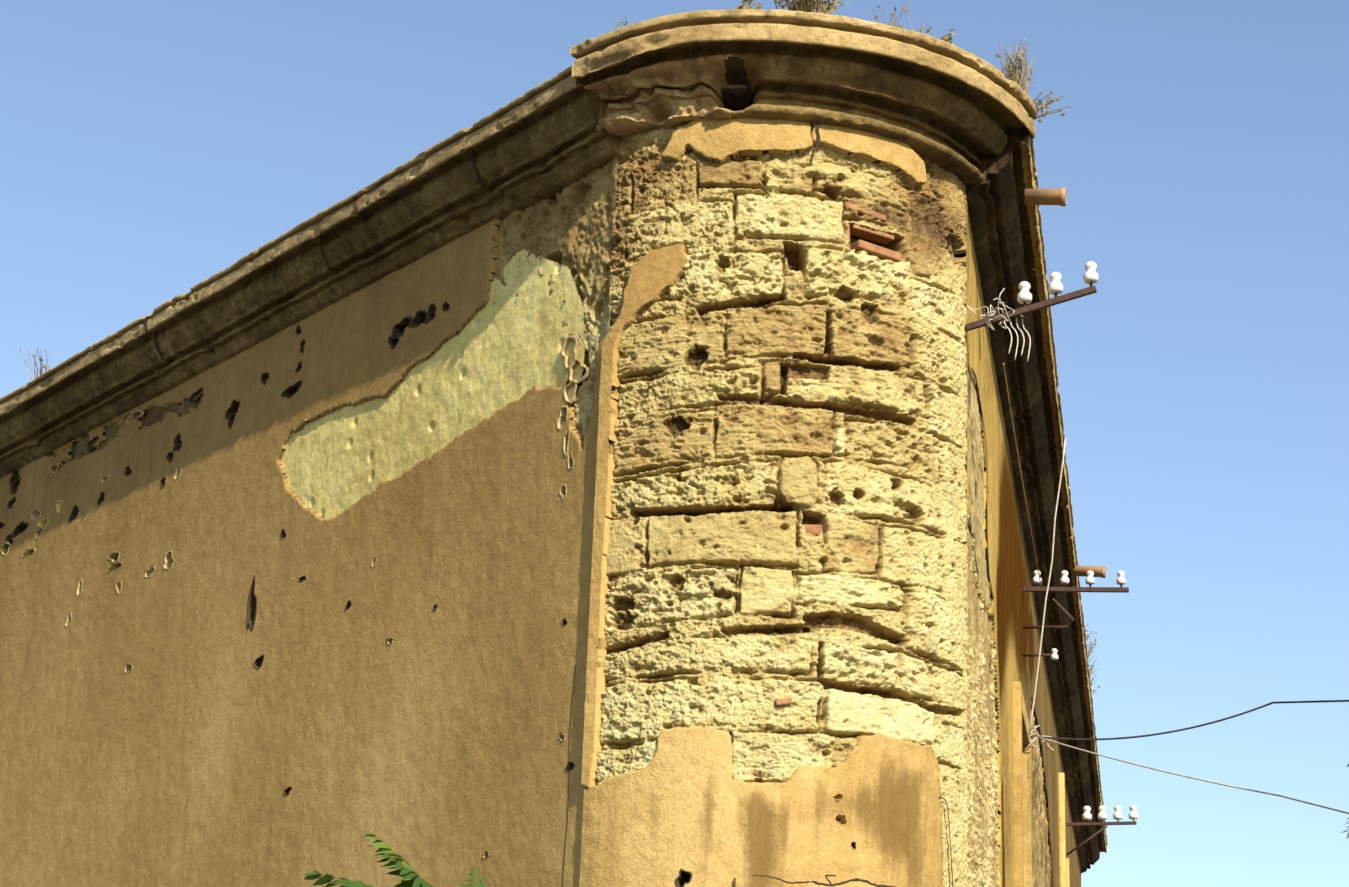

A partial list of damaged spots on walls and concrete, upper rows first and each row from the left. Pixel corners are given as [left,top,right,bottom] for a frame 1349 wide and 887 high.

flaking render [48,387,204,488]
spalling [225,399,240,429]
spalling [0,469,79,557]
spalling [97,466,132,506]
flaking render [280,118,1000,887]
spalling [106,551,123,594]
spalling [145,550,175,578]
spalling [247,575,257,631]
leakage [997,439,1034,702]
flaking render [1029,696,1054,887]